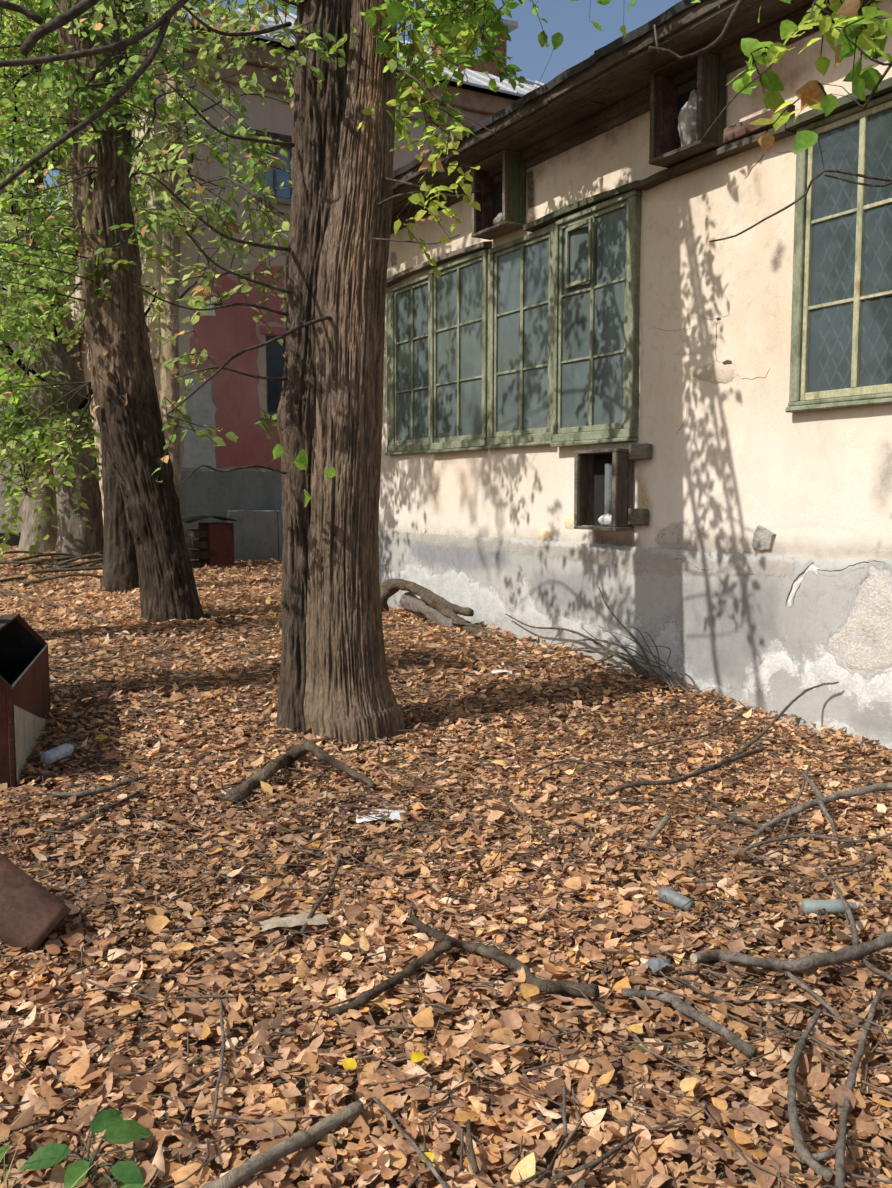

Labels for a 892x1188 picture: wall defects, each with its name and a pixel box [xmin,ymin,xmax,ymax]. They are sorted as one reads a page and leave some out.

crack [651,313,770,379]
spalling [720,357,737,377]
spalling [379,552,892,750]